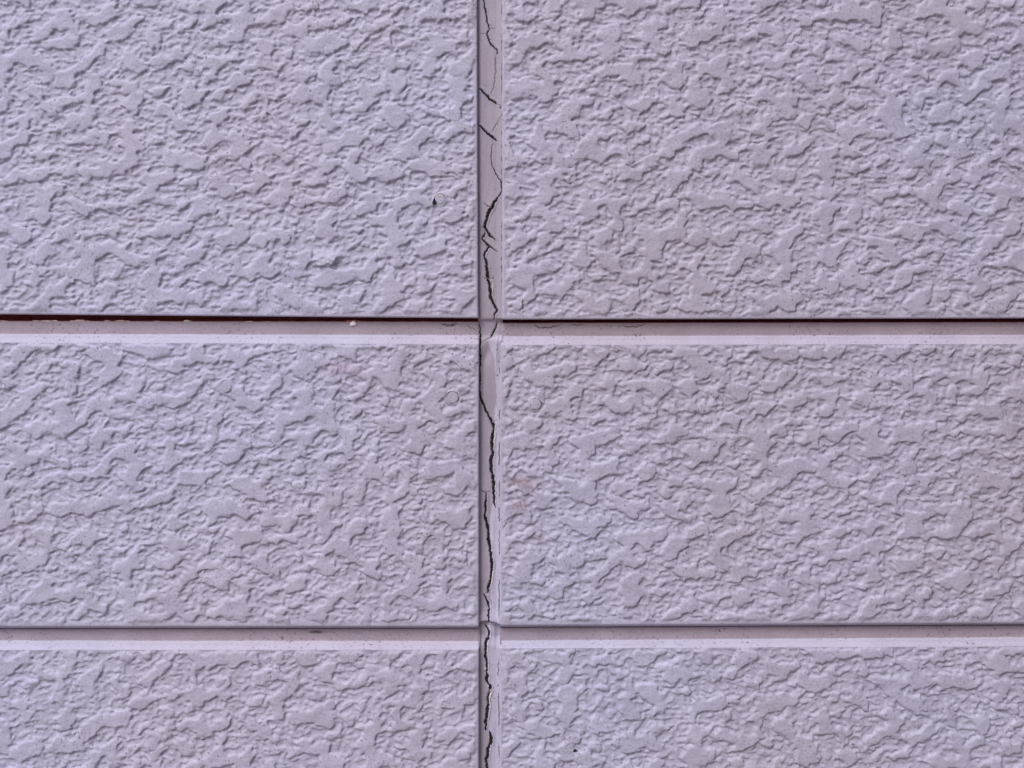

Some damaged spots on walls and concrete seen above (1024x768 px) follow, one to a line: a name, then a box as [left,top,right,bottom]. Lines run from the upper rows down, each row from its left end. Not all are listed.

crack [441,0,582,768]